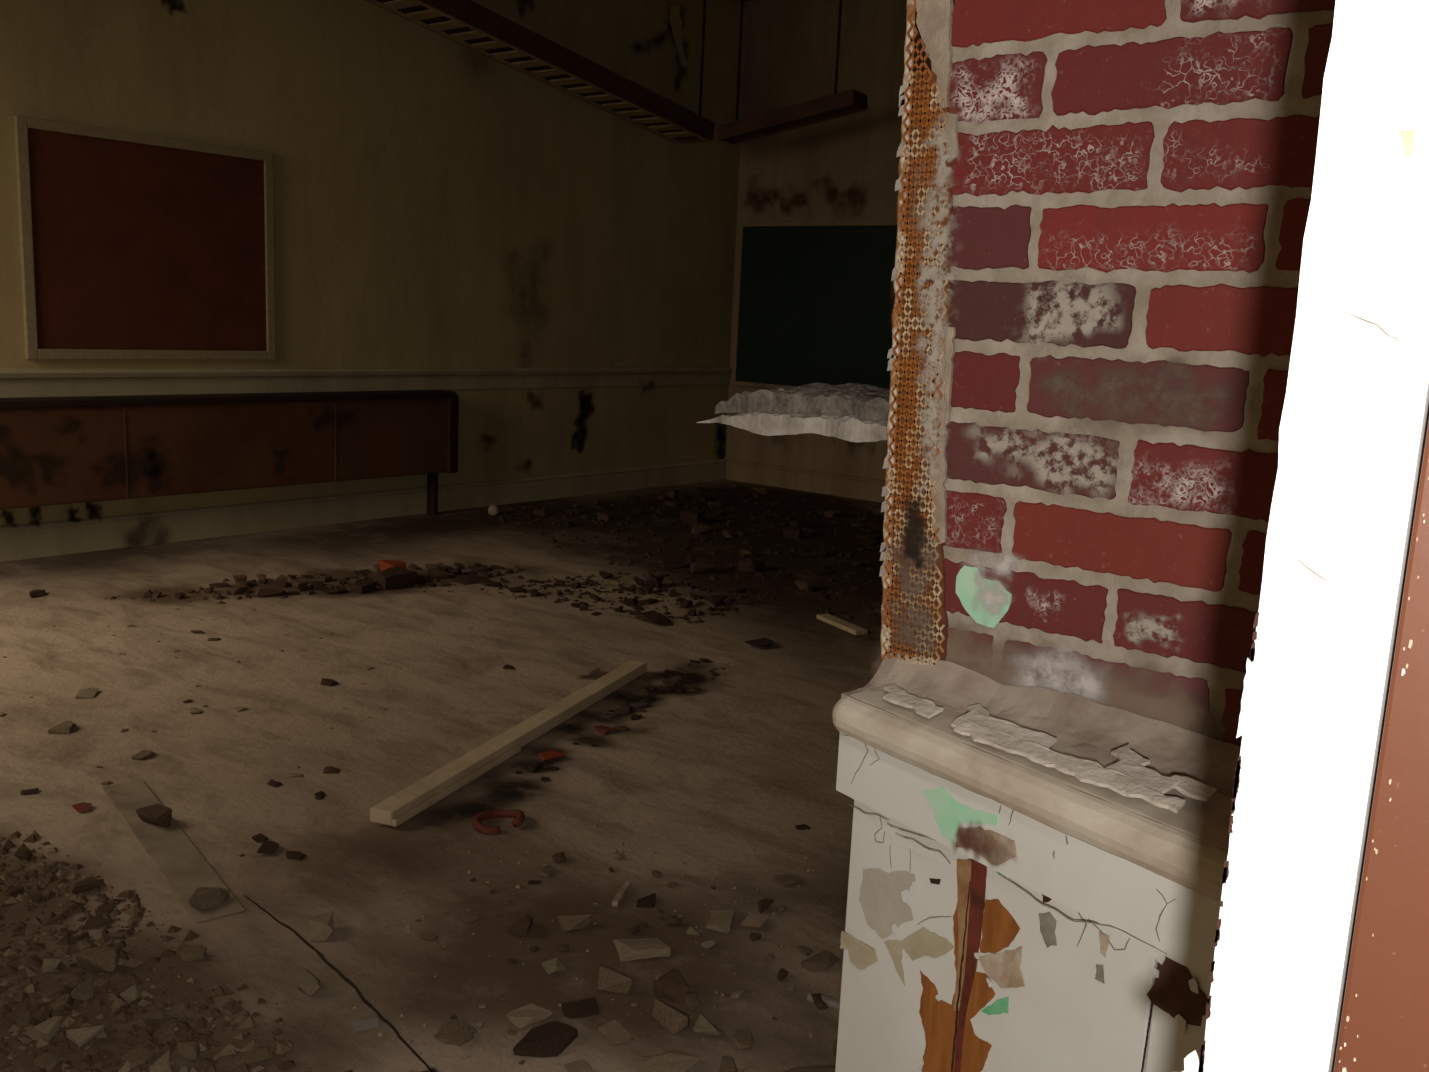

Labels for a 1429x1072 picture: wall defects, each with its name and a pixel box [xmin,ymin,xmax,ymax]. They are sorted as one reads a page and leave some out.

peeling [898,84,907,116]
corrosion [900,87,946,473]
peeling [887,347,895,371]
peeling [879,542,887,576]
crack [843,735,950,869]
flaking render [840,612,1260,1072]
crack [997,873,1176,954]